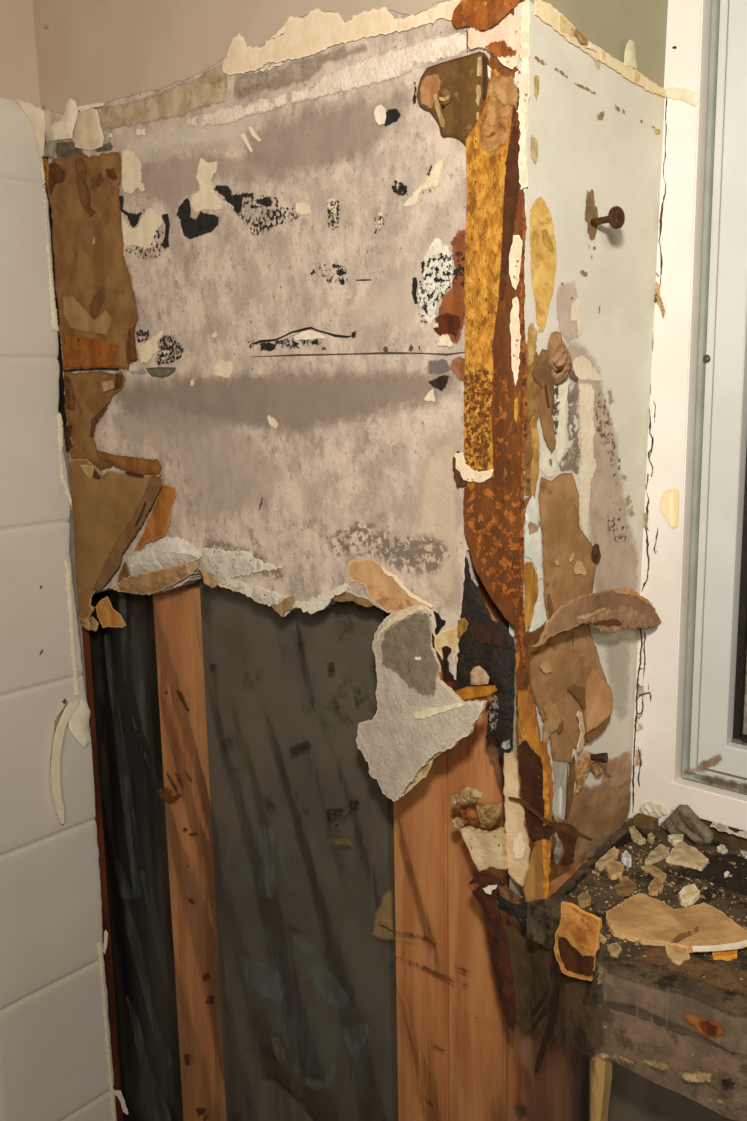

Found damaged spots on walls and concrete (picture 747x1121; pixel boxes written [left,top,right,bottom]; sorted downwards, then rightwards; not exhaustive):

peeling [222,0,461,75]
spalling [412,14,521,146]
crack [658,97,667,286]
flaking render [412,238,453,402]
rust [434,230,466,343]
damp [118,373,450,433]
damp [204,539,283,578]
damp [331,431,458,598]
rust [450,126,559,882]
crack [642,384,658,591]
crack [632,628,652,811]
flaking render [595,822,747,897]